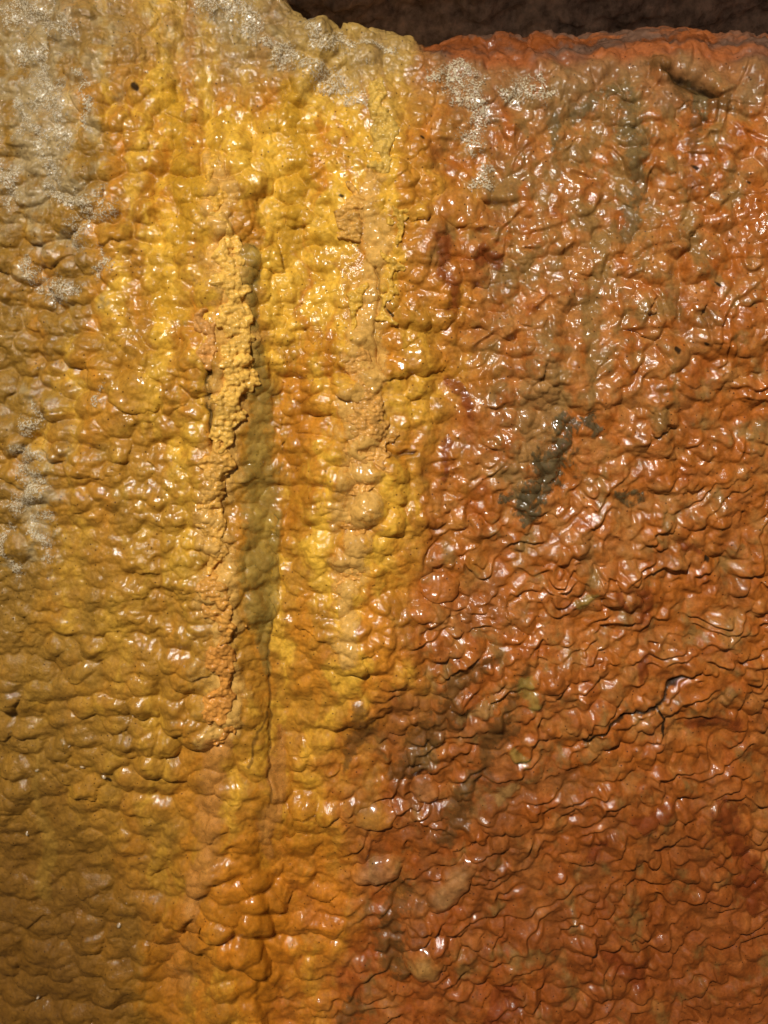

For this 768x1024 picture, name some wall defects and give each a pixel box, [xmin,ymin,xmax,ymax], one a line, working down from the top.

corrosion [424,31,597,54]
efflorescence [0,0,122,278]
efflorescence [424,56,556,190]
efflorescence [18,254,83,313]
efflorescence [0,392,61,585]
water stain [498,410,603,528]
water stain [614,489,644,507]
crack [583,676,687,742]